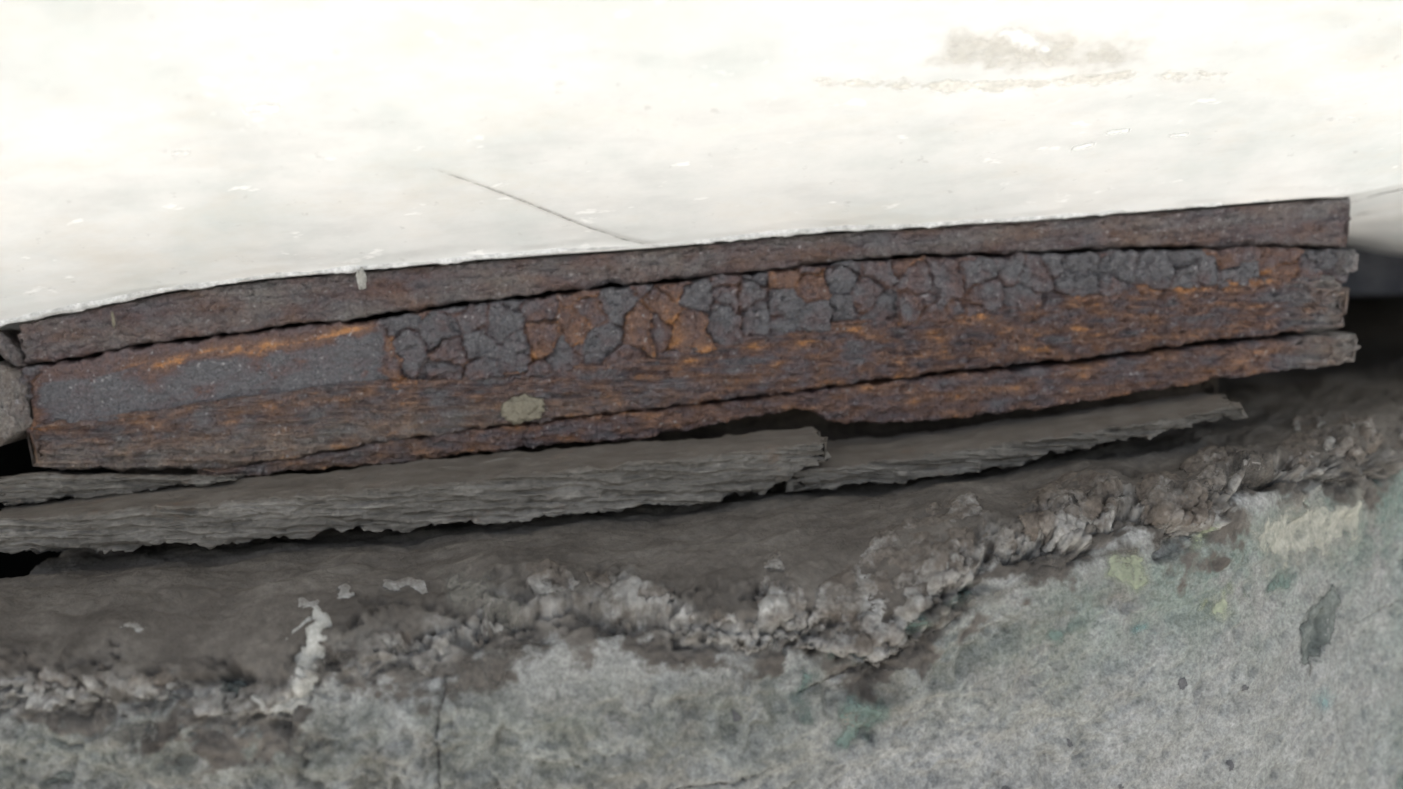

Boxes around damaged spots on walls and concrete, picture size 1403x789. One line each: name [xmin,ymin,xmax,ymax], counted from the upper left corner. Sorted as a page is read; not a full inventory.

corrosion [0,328,49,368]
corrosion [0,393,1248,554]
spalling [1018,439,1242,553]